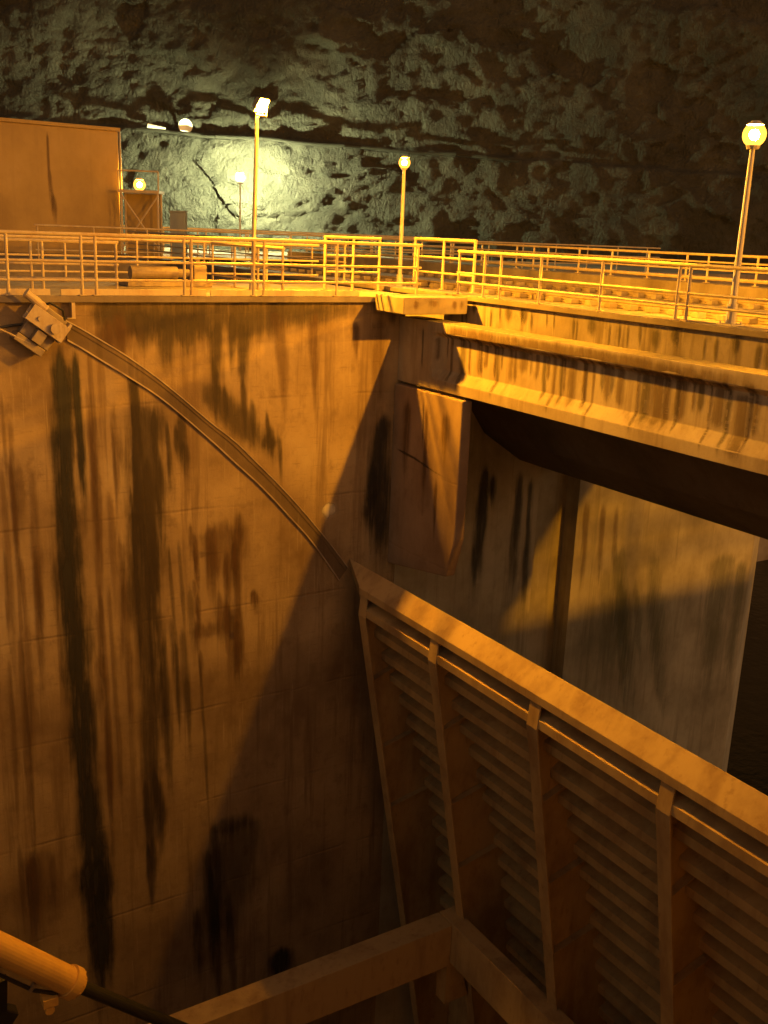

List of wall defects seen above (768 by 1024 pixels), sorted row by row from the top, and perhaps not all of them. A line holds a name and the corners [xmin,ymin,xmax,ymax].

damp [449,302,758,451]
damp [364,417,390,547]
damp [472,470,495,577]
damp [513,478,532,590]
damp [51,351,113,988]